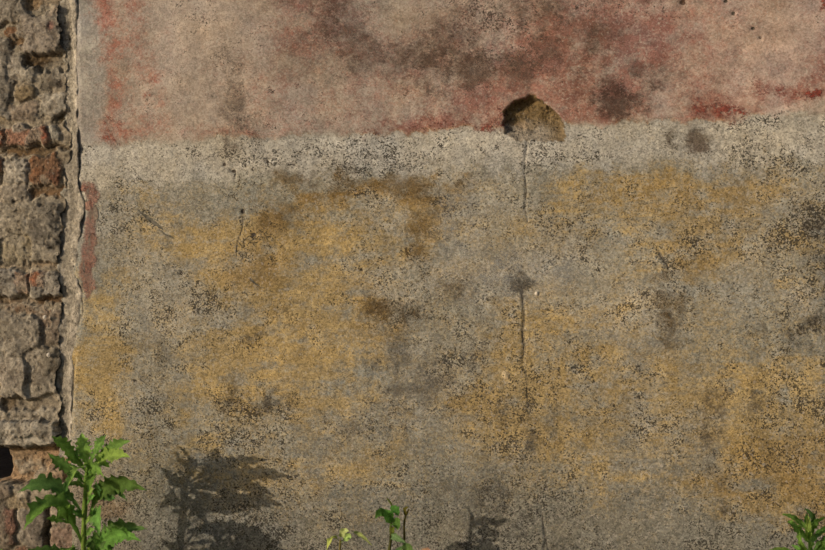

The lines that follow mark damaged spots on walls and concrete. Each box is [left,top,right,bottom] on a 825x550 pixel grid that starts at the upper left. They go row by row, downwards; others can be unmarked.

water stain [325,27,555,90]
spalling [502,94,567,143]
water stain [592,80,642,119]